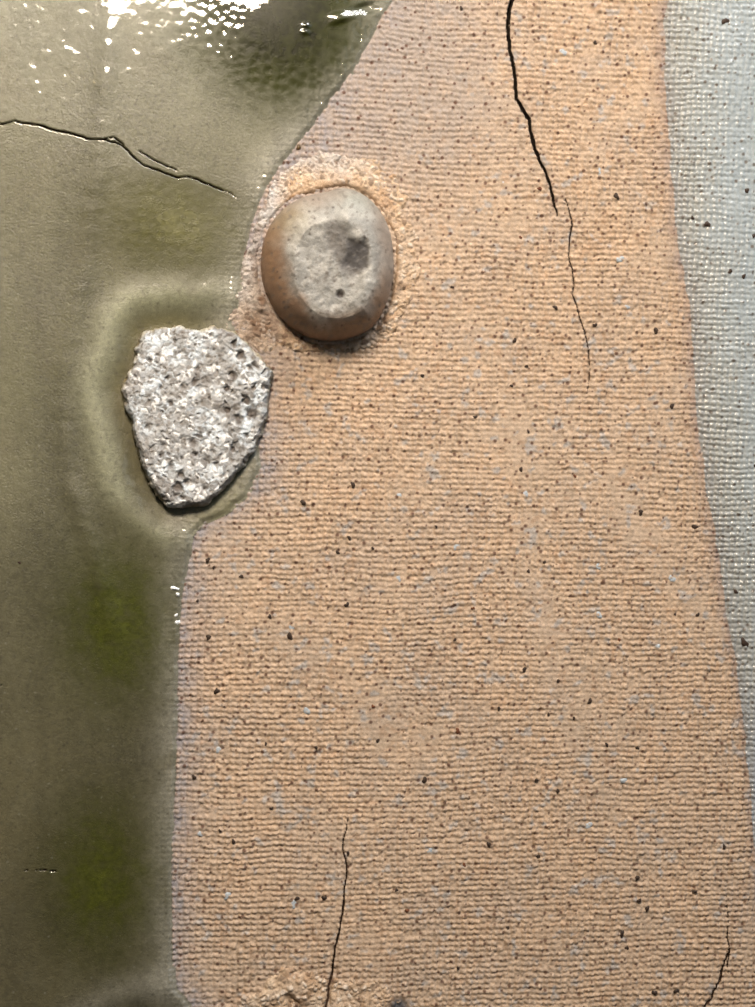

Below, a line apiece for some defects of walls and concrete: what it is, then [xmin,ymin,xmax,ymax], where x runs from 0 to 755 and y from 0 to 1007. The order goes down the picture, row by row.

damp [201,0,364,100]
crack [1,120,234,196]
crack [506,0,590,391]
crack [325,821,348,1007]
crack [704,900,730,1007]